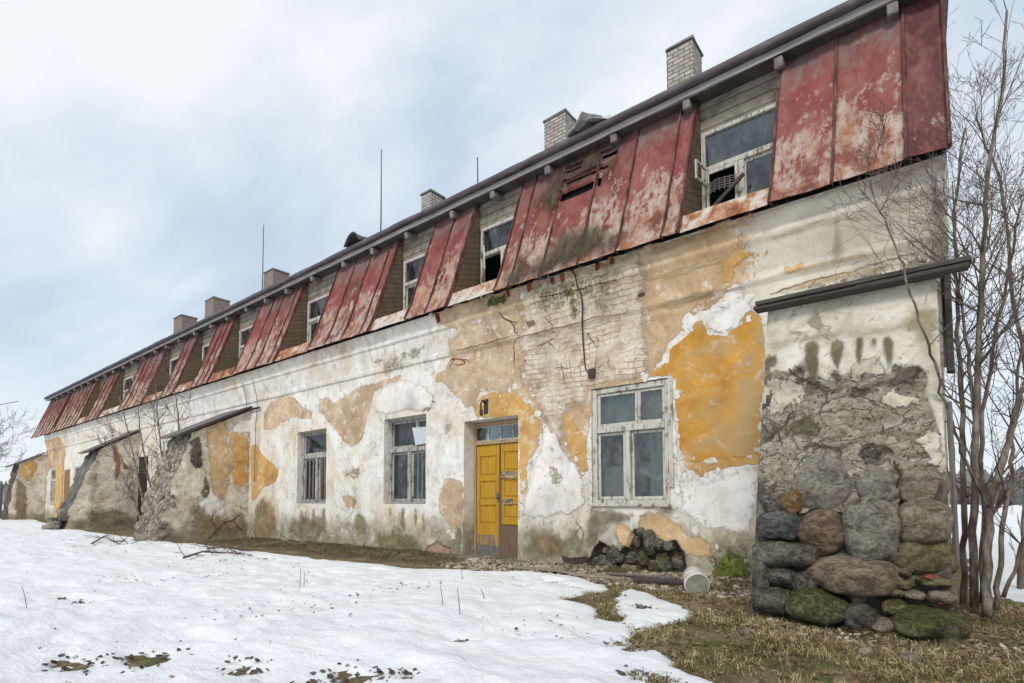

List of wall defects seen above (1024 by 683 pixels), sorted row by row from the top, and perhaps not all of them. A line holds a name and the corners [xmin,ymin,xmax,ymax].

rust [504,225,618,297]
peeling [263,344,425,447]
crack [450,280,616,381]
flaking render [428,160,946,484]
leakage [764,344,778,381]
leakage [805,335,843,388]
leakage [856,336,893,365]
peeling [44,437,66,475]
crack [769,365,932,502]
peeling [428,470,464,555]
flaking render [561,507,719,573]